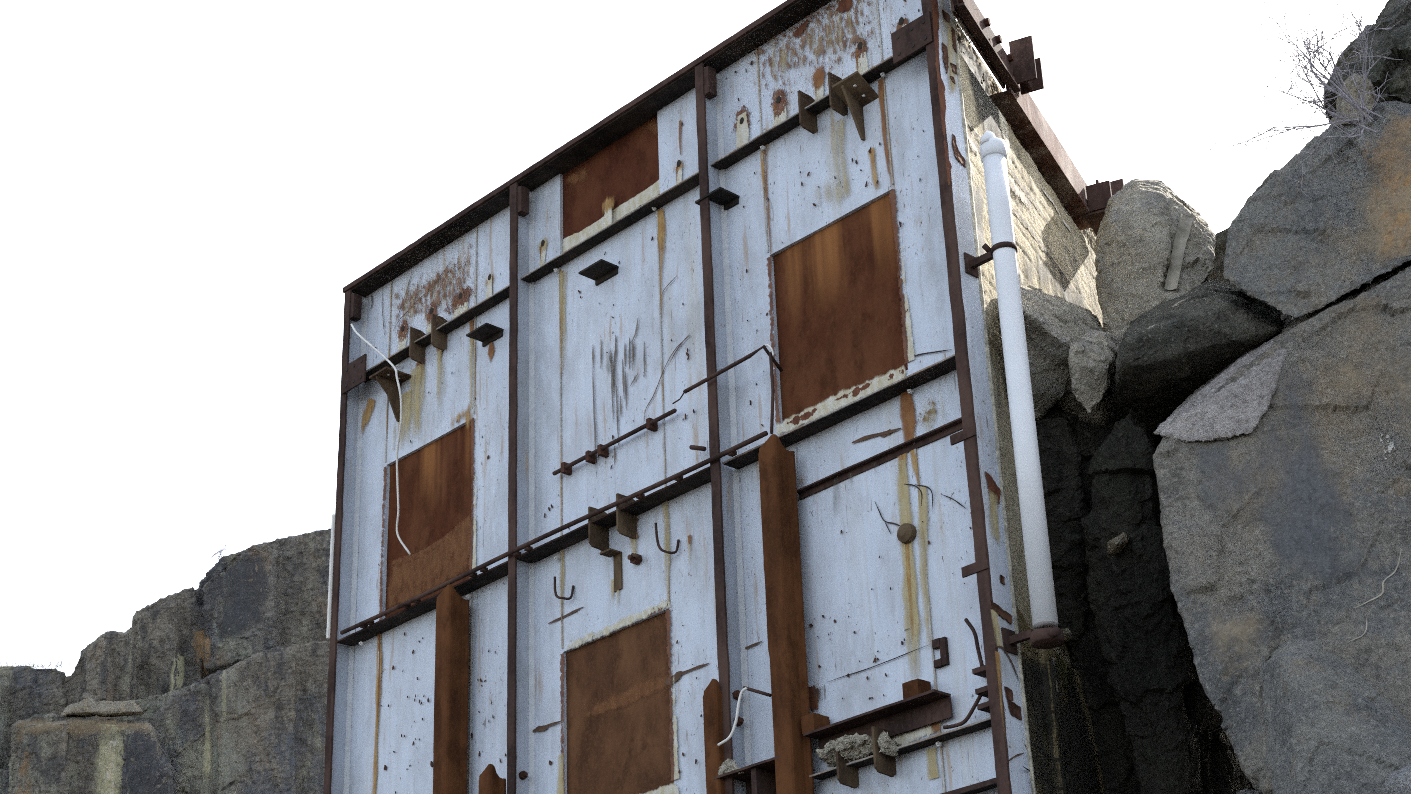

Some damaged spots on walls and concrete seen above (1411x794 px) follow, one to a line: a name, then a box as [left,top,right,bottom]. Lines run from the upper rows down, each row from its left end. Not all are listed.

rust [812,66,825,101]
rust [602,198,614,228]
rust [362,398,375,431]
rust [396,274,494,439]
rust [389,516,471,607]
rust [897,391,936,671]
rust [372,633,382,794]
water stain [1024,657,1100,794]